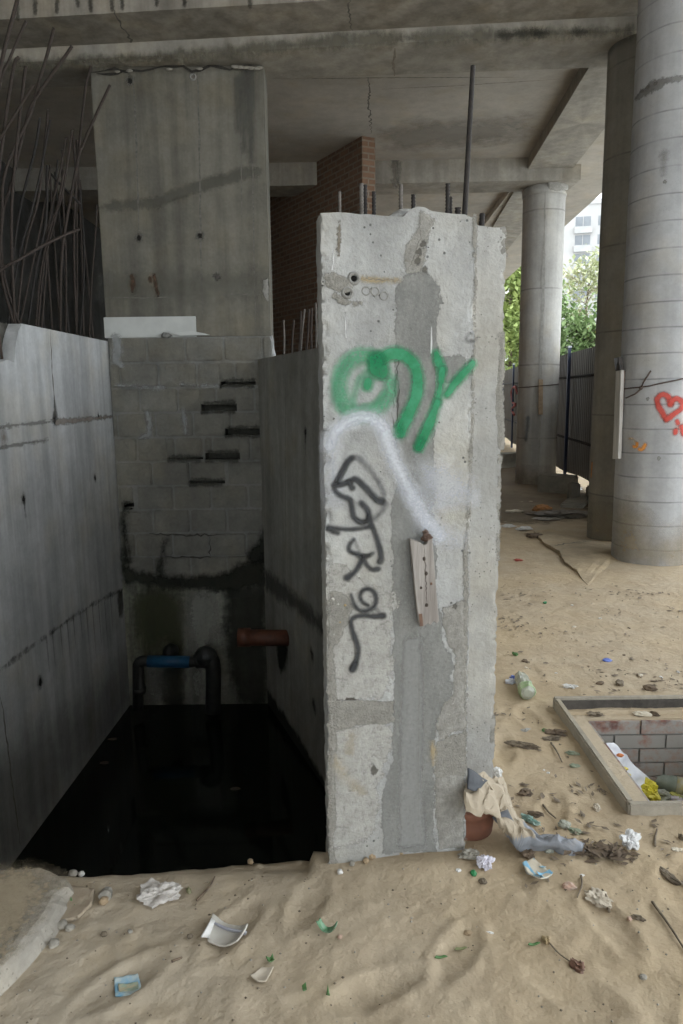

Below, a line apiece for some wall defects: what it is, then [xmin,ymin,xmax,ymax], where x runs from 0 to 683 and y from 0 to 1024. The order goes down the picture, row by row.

crack [367,77,555,133]
spalling [445,183,485,327]
damp [90,501,325,788]
peeling [326,240,476,864]